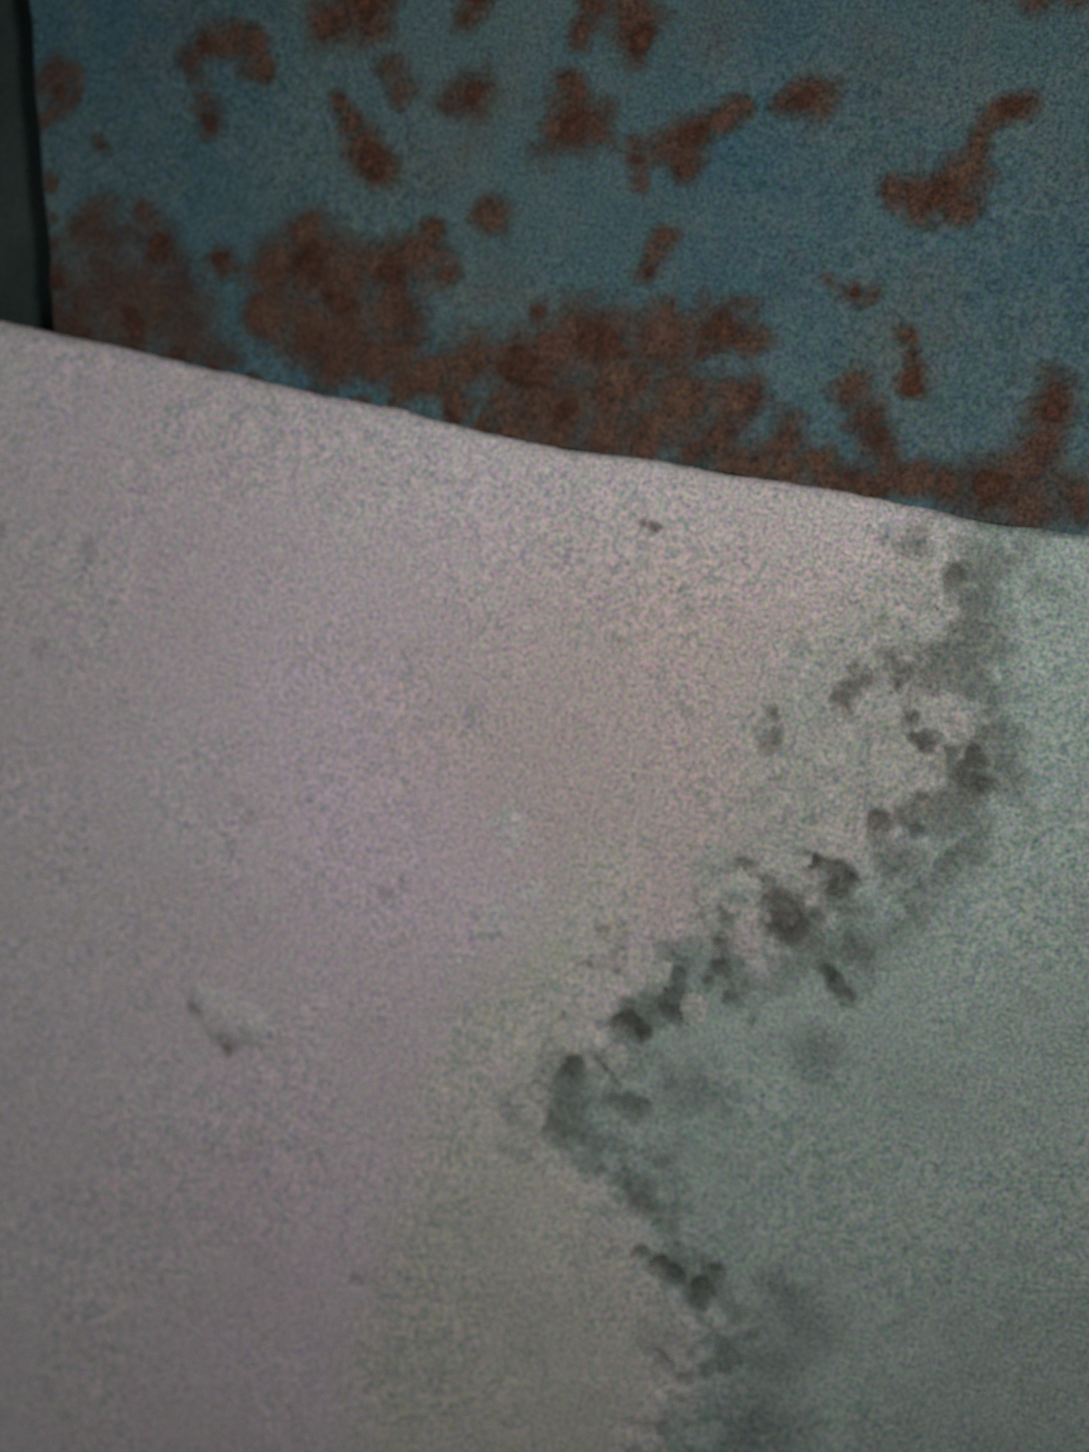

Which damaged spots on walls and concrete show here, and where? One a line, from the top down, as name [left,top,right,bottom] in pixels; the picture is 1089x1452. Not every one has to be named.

rust [181,22,274,136]
rust [310,0,396,42]
rust [332,91,397,185]
rust [441,76,490,113]
rust [472,197,507,232]
rust [571,0,660,66]
rust [544,70,753,190]
rust [772,79,835,116]
rust [881,94,1038,225]
rust [49,216,89,340]
rust [210,211,1089,529]
spalling [497,505,1089,1452]